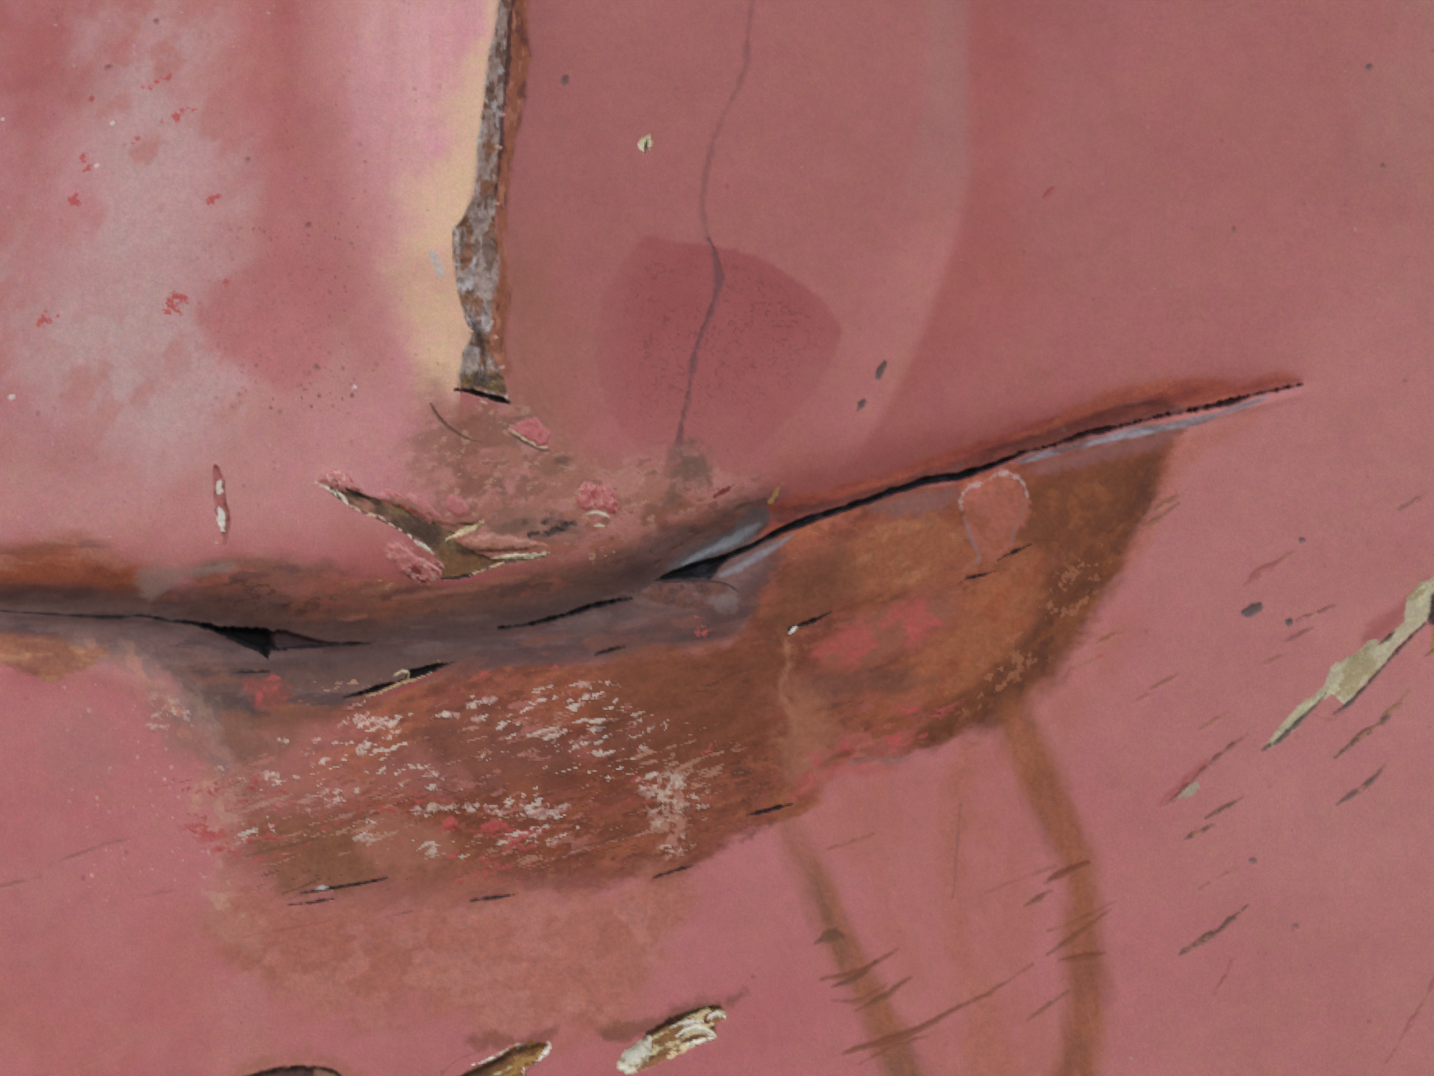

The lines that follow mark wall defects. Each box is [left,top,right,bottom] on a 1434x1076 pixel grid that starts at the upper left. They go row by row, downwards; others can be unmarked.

corrosion [488,0,534,381]
crack [656,0,757,516]
corrosion [0,524,150,600]
peeling [313,468,553,586]
crack [0,382,1304,661]
corrosion [0,636,112,686]
corrosion [144,691,196,733]
corrosion [154,367,1304,1076]
peeling [1158,575,1434,809]
peeling [241,1063,345,1076]
peeling [438,1043,552,1076]
peeling [616,1004,730,1076]